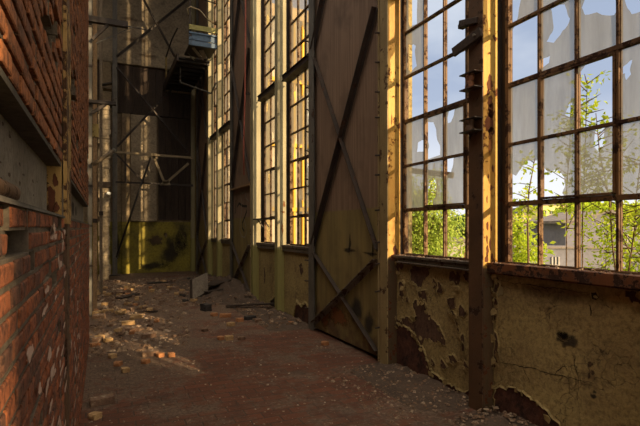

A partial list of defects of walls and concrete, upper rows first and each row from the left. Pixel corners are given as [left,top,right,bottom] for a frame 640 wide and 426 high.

corrosion [484,75,495,154]
damp [142,226,188,269]
spalling [395,261,469,396]
mould [556,331,577,347]
spalling [491,384,563,426]